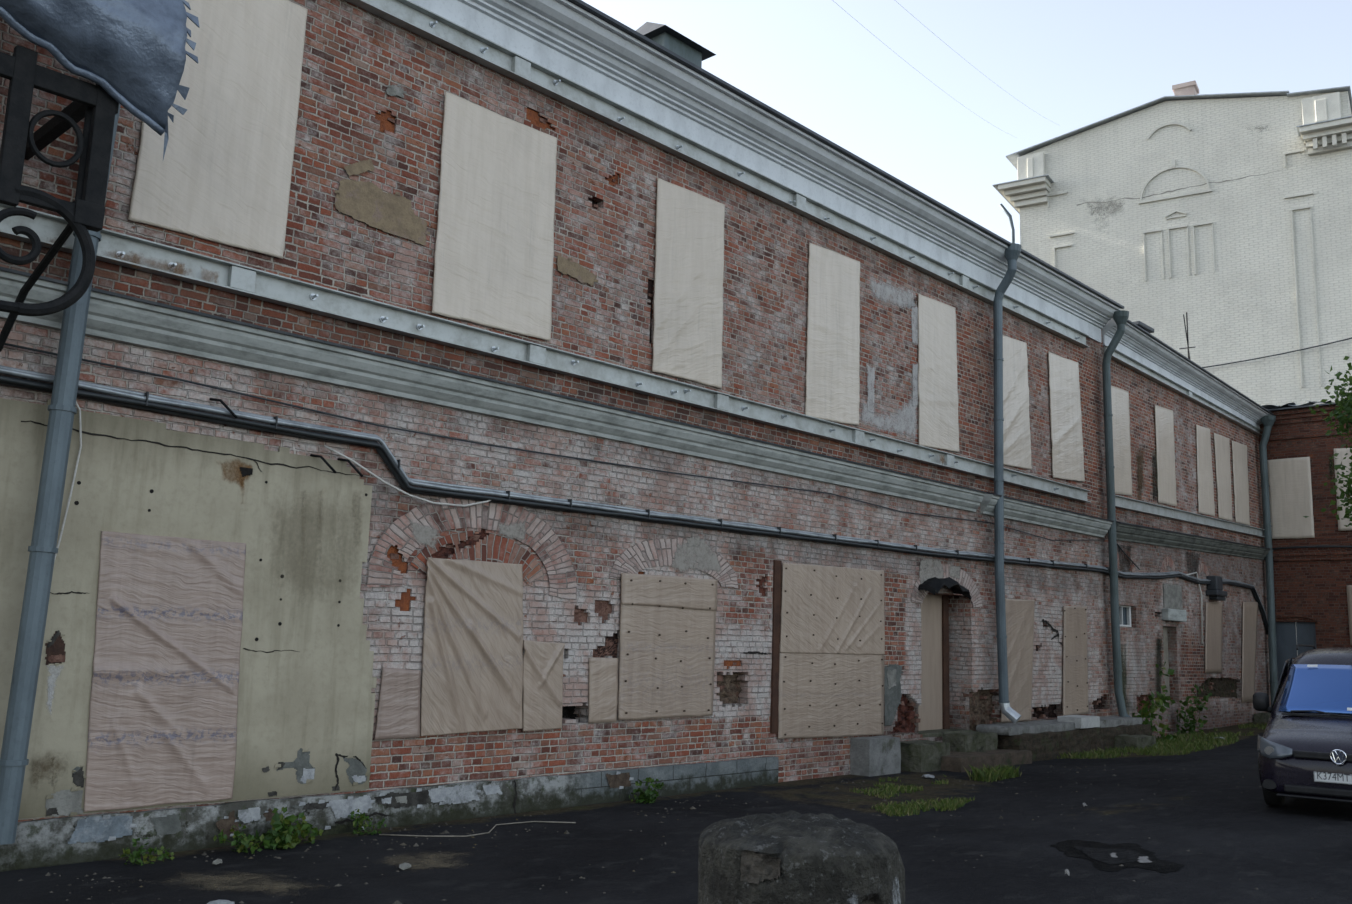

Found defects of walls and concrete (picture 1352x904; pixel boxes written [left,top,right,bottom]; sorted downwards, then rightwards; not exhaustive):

water stain [871,278,918,344]
water stain [862,364,918,437]
spalling [387,545,407,573]
spalling [395,589,416,611]
spalling [45,630,66,665]
crack [243,646,299,654]
spalling [574,600,618,658]
spalling [717,660,742,704]
peeling [884,664,921,733]
spalling [962,689,997,731]
peeling [262,748,315,784]
peeling [216,755,502,839]